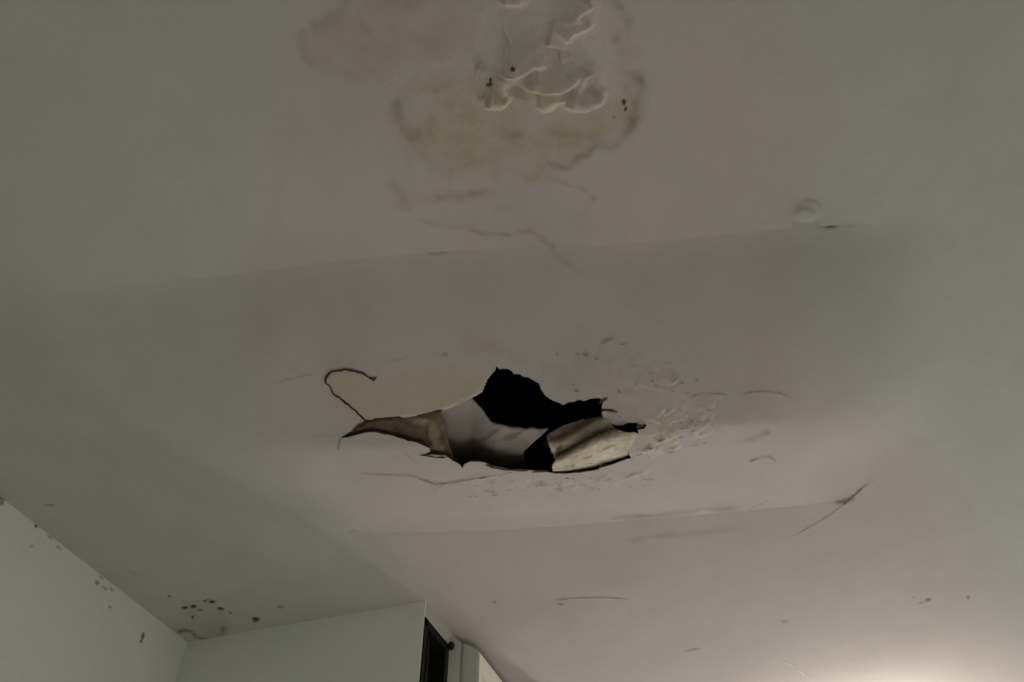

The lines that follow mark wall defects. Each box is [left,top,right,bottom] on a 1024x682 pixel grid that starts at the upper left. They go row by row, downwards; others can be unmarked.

leakage [296,0,659,215]
crack [324,369,376,445]
spalling [326,351,647,479]